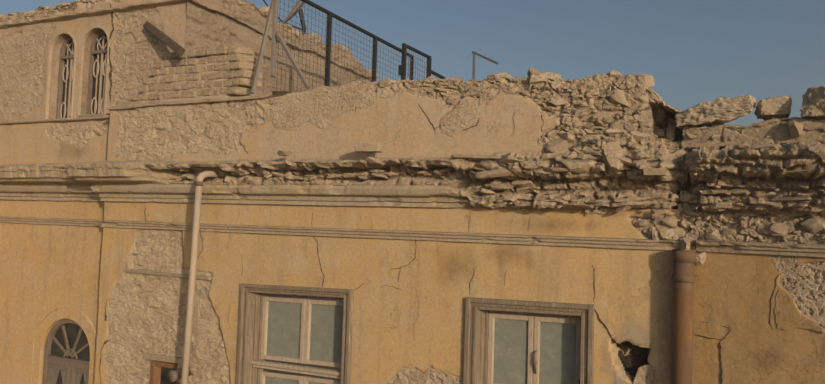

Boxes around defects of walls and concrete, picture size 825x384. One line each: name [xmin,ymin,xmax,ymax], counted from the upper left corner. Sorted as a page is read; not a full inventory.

spalling [47,0,825,173]
spalling [105,229,230,384]
crack [384,240,419,340]
crack [592,266,613,339]
spalling [768,256,825,334]
spalling [387,366,463,384]
spalling [616,341,654,384]
crack [696,322,730,384]